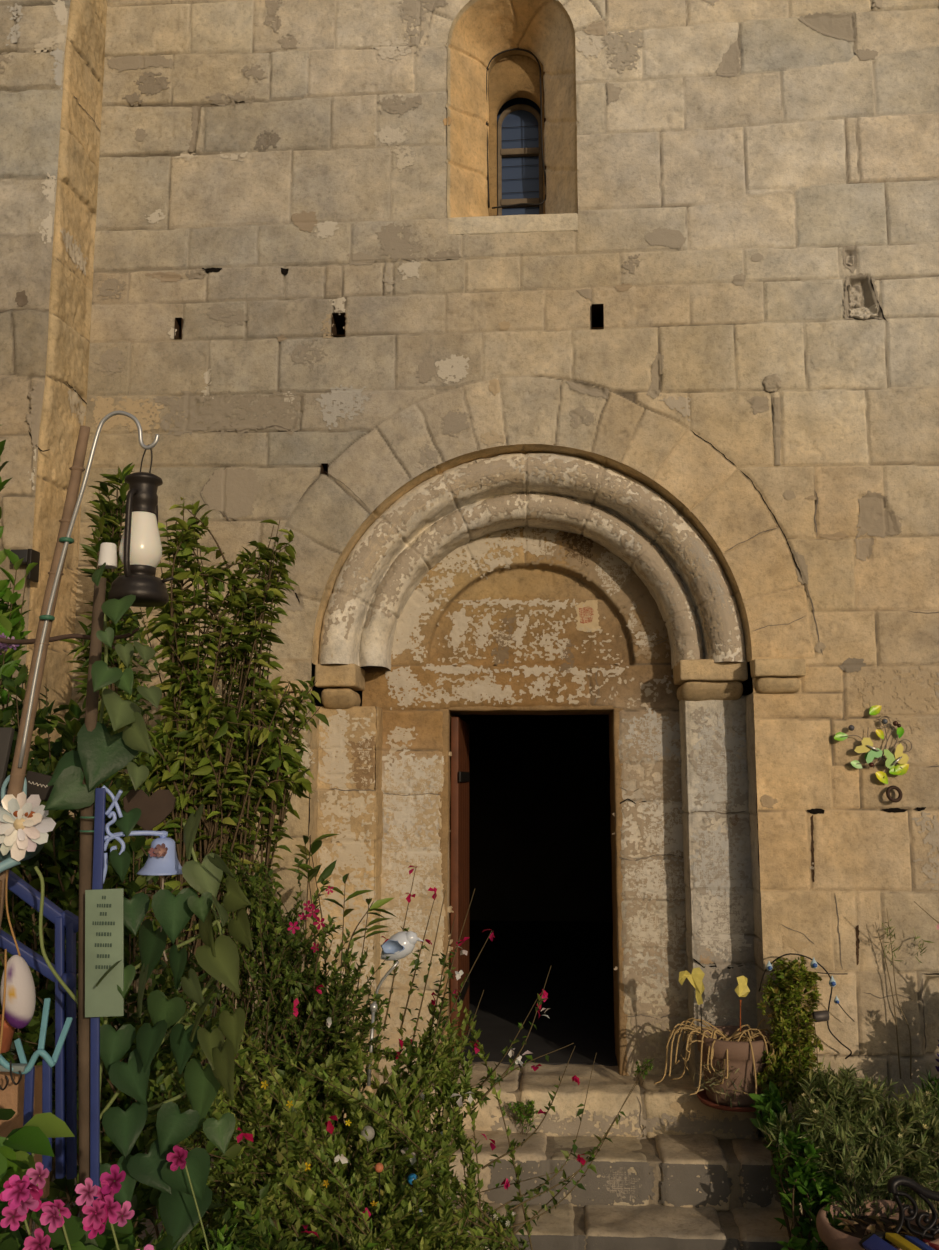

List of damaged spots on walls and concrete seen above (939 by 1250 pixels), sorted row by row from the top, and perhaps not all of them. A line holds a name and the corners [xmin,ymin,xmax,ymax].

peeling [317,455,778,1075]